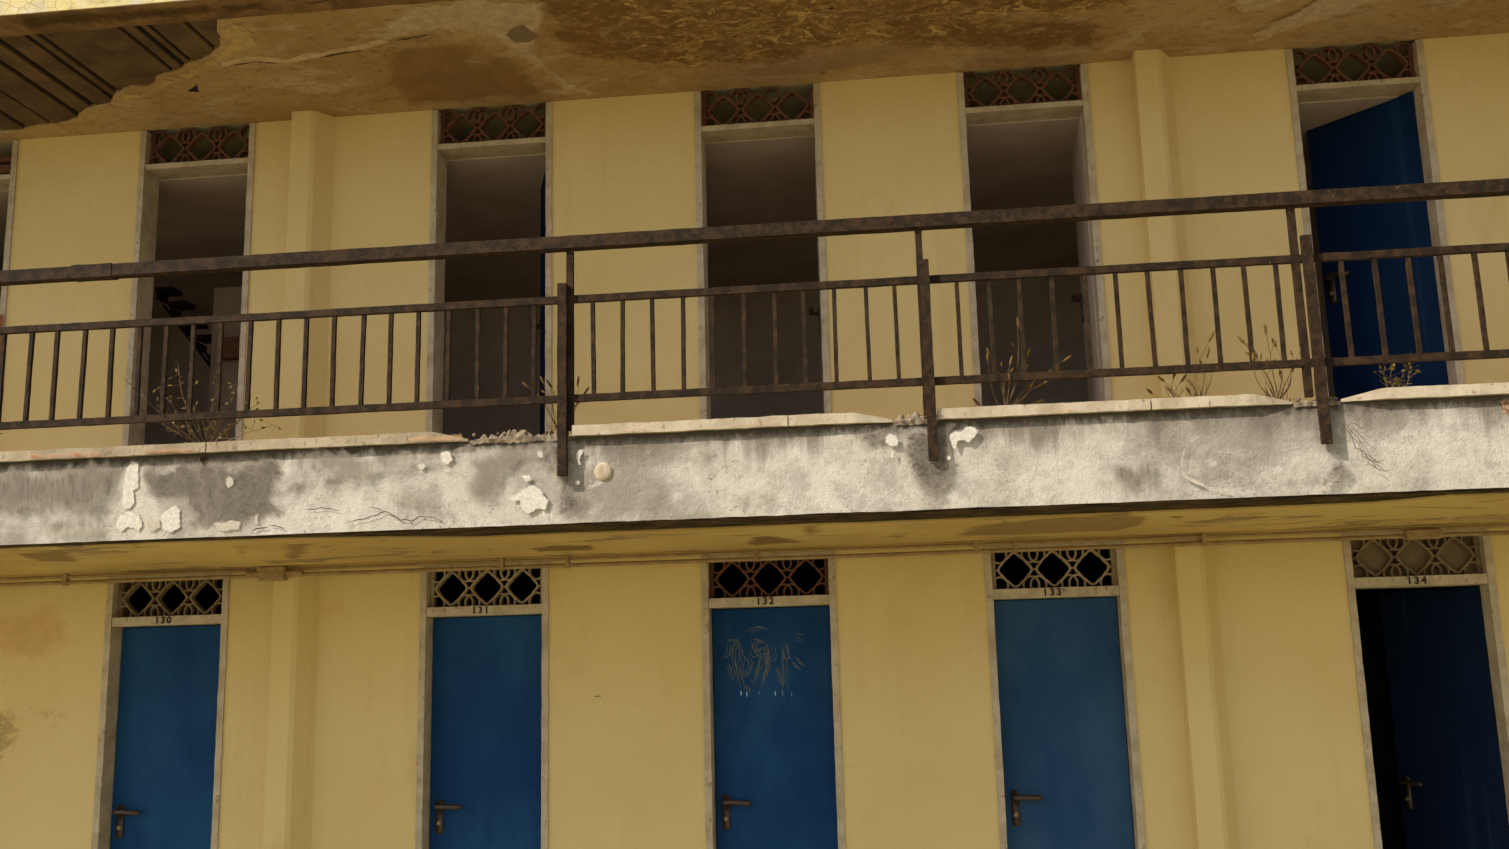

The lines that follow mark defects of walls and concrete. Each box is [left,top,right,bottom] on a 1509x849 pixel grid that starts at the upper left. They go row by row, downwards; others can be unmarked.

peeling [83,0,592,120]
leakage [385,46,536,105]
leakage [539,0,1127,78]
peeling [1234,0,1395,41]
spalling [469,429,584,484]
peeling [115,461,180,533]
leakage [142,456,304,527]
peeling [215,515,258,531]
crack [252,506,444,531]
peeling [511,475,548,516]